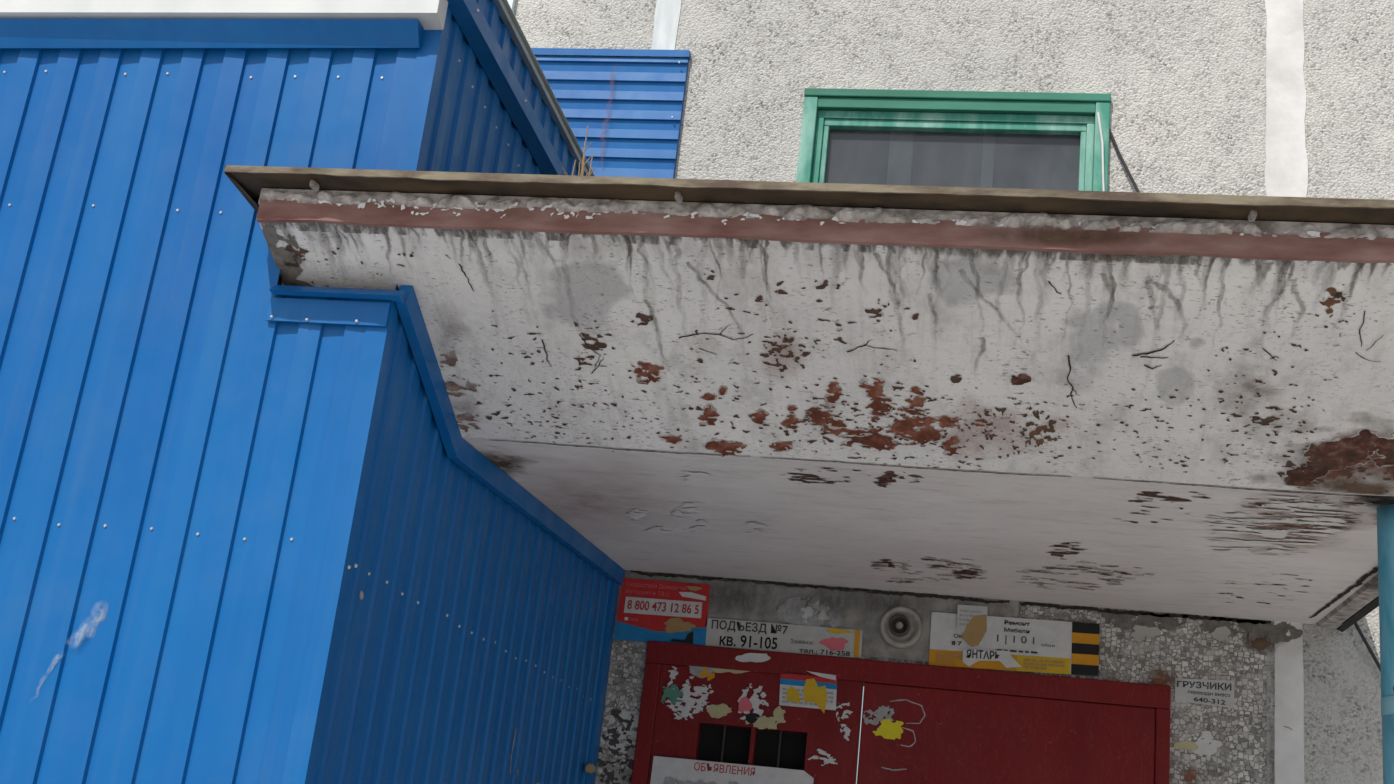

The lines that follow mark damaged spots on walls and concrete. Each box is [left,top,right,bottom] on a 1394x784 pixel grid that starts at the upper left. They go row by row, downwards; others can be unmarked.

water stain [1327,261,1391,292]